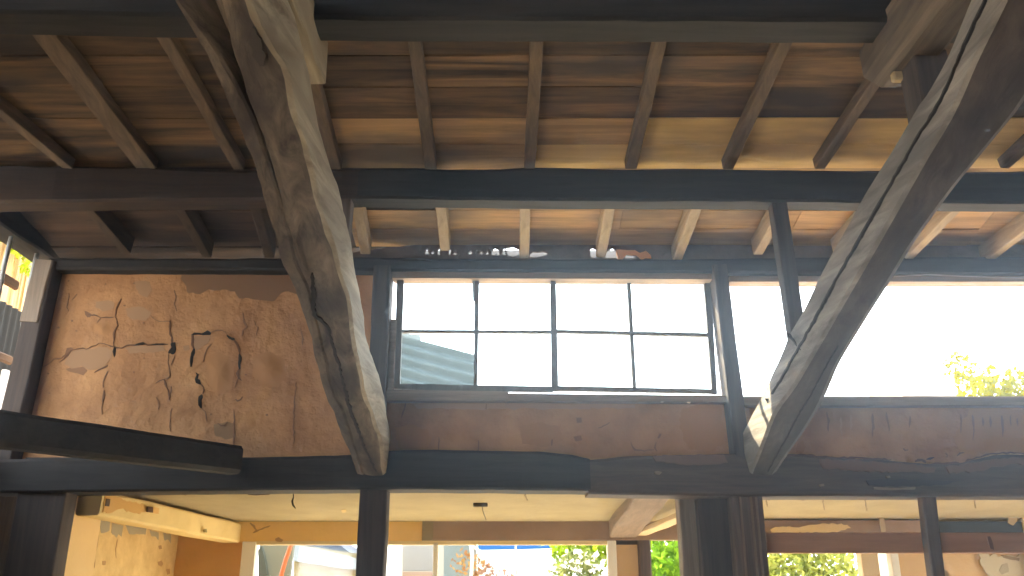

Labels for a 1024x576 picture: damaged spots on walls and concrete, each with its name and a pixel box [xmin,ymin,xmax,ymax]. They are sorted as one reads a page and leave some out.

spalling [63,342,176,370]
crack [42,291,259,445]
peeling [100,496,171,543]
peeling [978,554,1024,576]